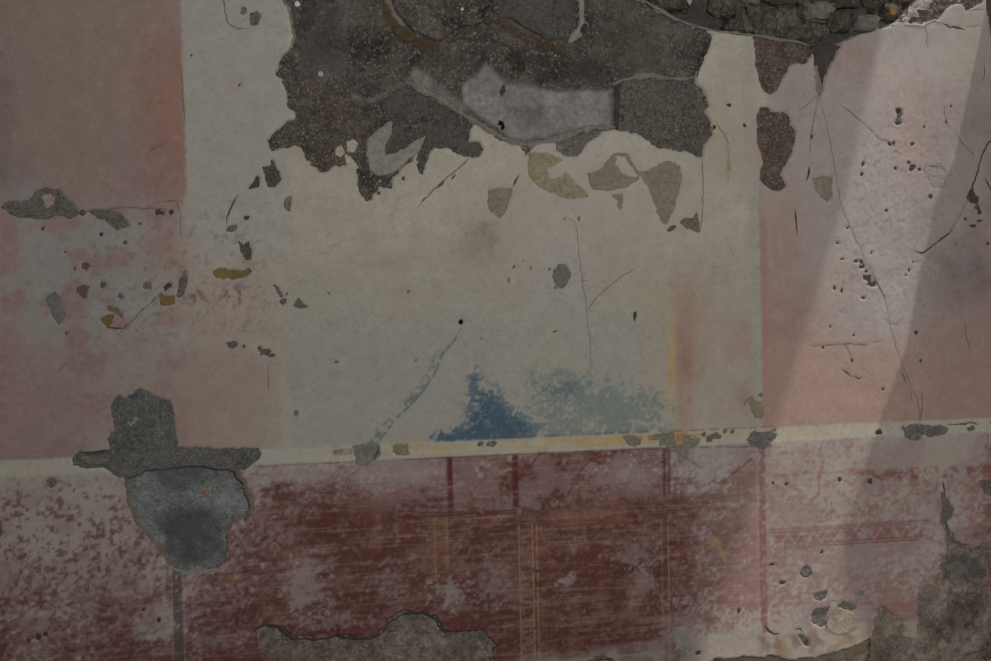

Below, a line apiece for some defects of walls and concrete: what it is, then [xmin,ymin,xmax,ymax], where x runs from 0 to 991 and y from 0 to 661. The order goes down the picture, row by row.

flaking render [0,188,174,236]
flaking render [76,281,106,299]
peeling [248,0,840,233]
crack [798,95,923,420]
crack [917,109,991,254]
flaking render [255,610,496,661]
flaking render [811,591,864,627]
flaking render [868,480,991,661]